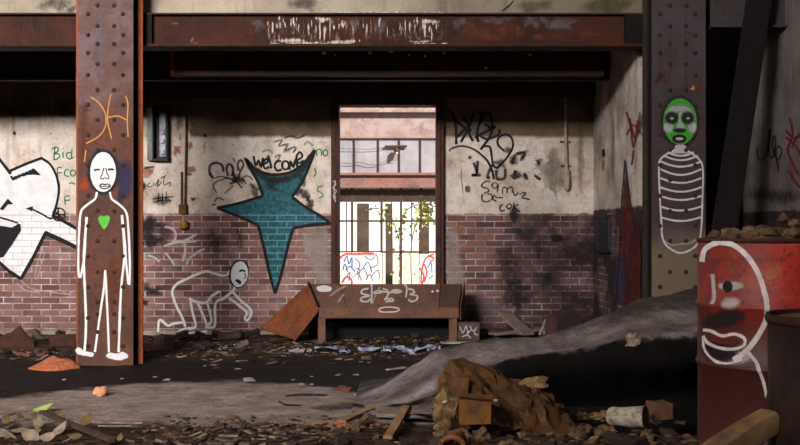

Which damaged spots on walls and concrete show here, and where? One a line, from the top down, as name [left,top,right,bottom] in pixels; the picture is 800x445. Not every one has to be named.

corrosion [106,263,120,301]